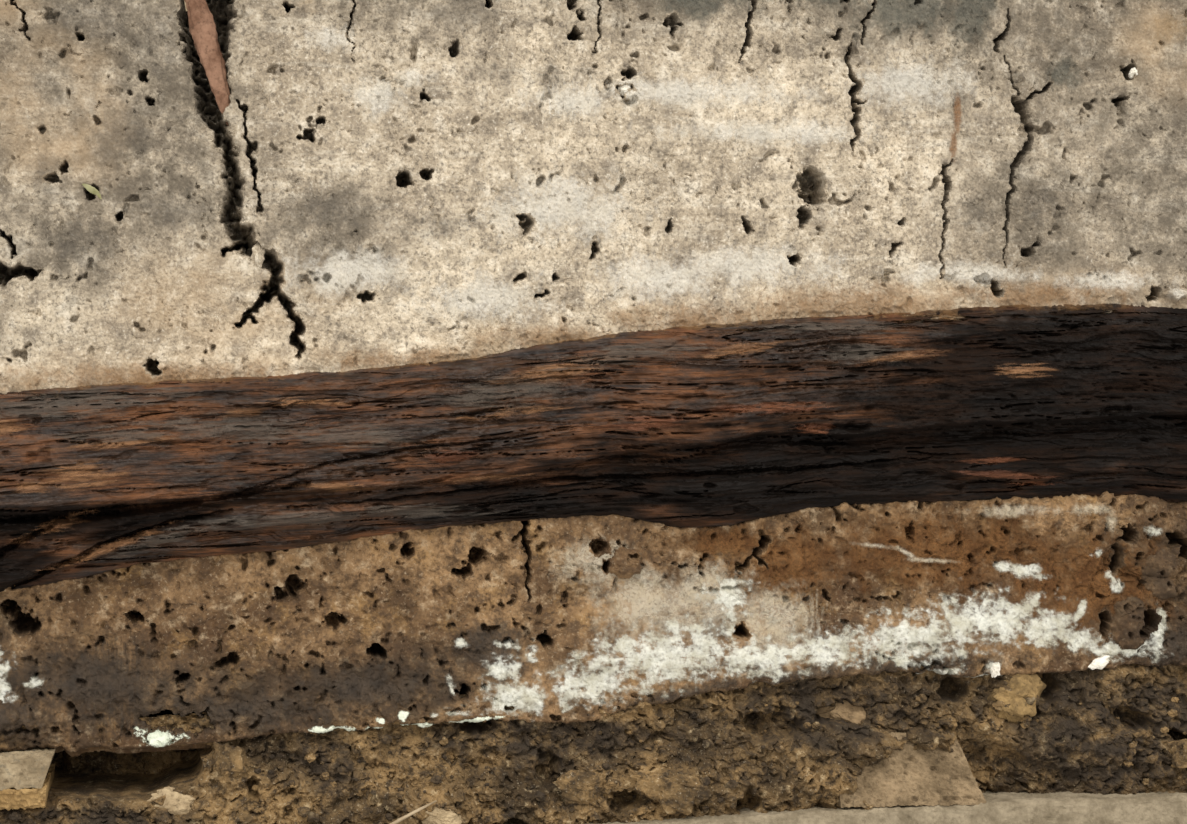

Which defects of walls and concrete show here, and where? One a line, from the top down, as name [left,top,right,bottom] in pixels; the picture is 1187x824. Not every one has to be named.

crack [0,229,43,287]
crack [175,0,307,360]
crack [844,0,877,152]
crack [992,7,1054,268]
water stain [996,562,1043,579]
water stain [0,571,1187,748]